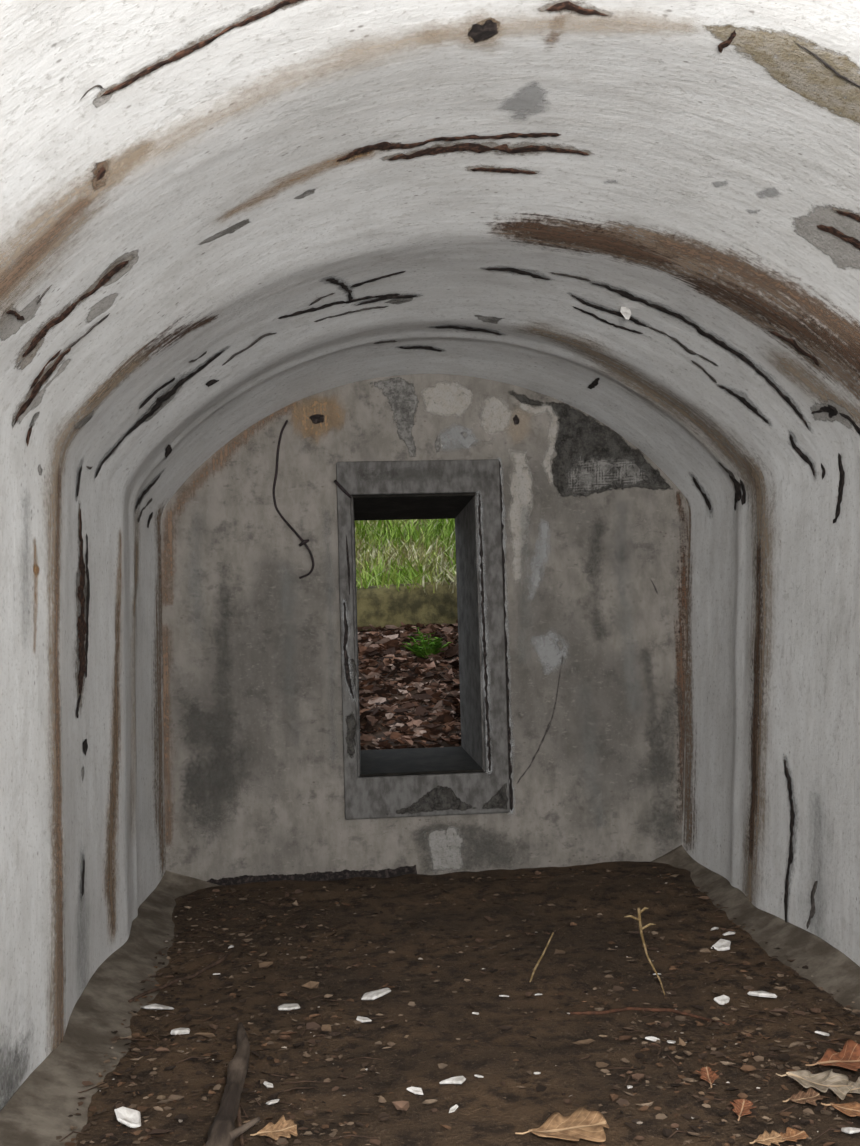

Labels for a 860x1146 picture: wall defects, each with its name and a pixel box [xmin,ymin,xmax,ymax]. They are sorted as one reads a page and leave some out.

crack [79,0,306,108]
spalling [428,18,500,43]
spalling [705,25,860,123]
crack [76,271,420,500]
crack [373,315,505,352]
spalling [370,377,671,598]
crack [482,267,860,523]
rust [487,214,860,424]
rust [33,315,217,1050]
peeling [534,633,566,673]
rust [525,326,772,904]
crack [784,757,818,929]